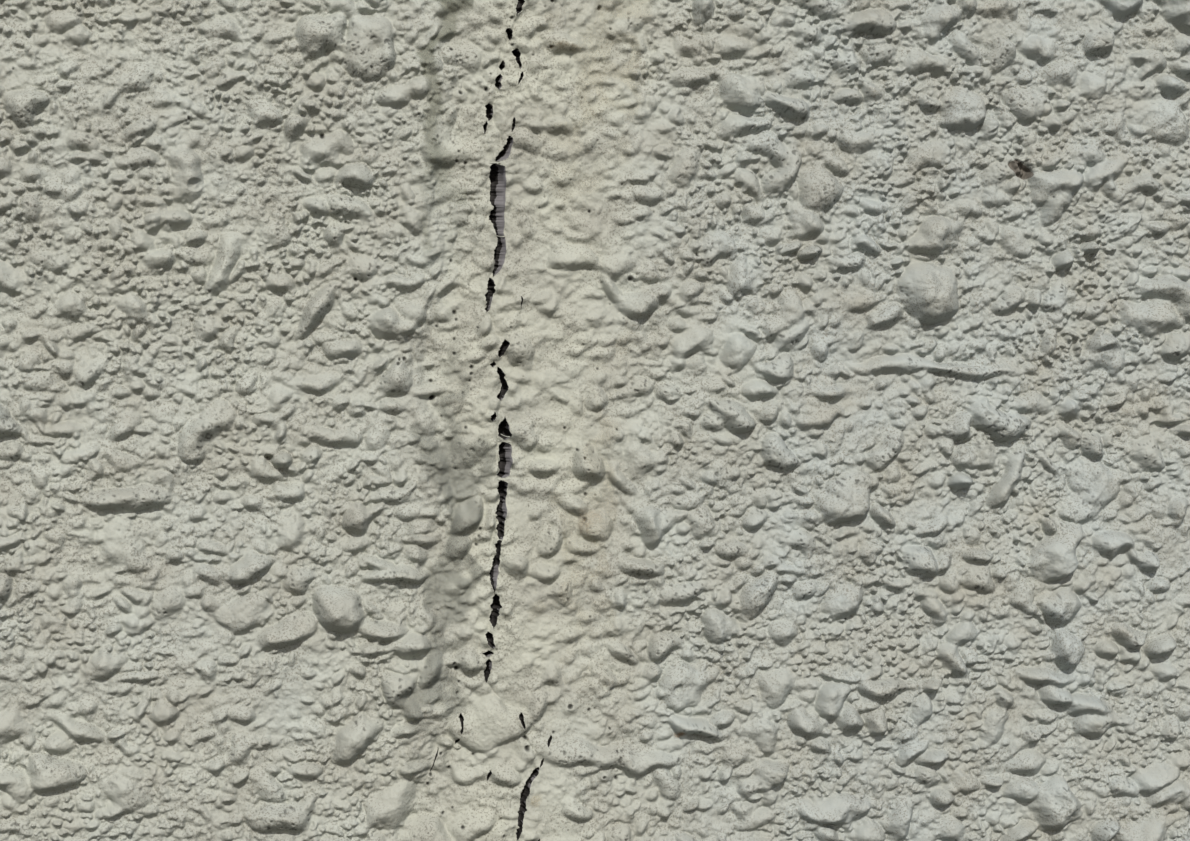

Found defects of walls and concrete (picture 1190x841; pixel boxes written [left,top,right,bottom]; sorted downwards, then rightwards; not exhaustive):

crack [482,0,526,312]
crack [481,340,514,683]
crack [429,713,465,773]
crack [515,712,553,841]